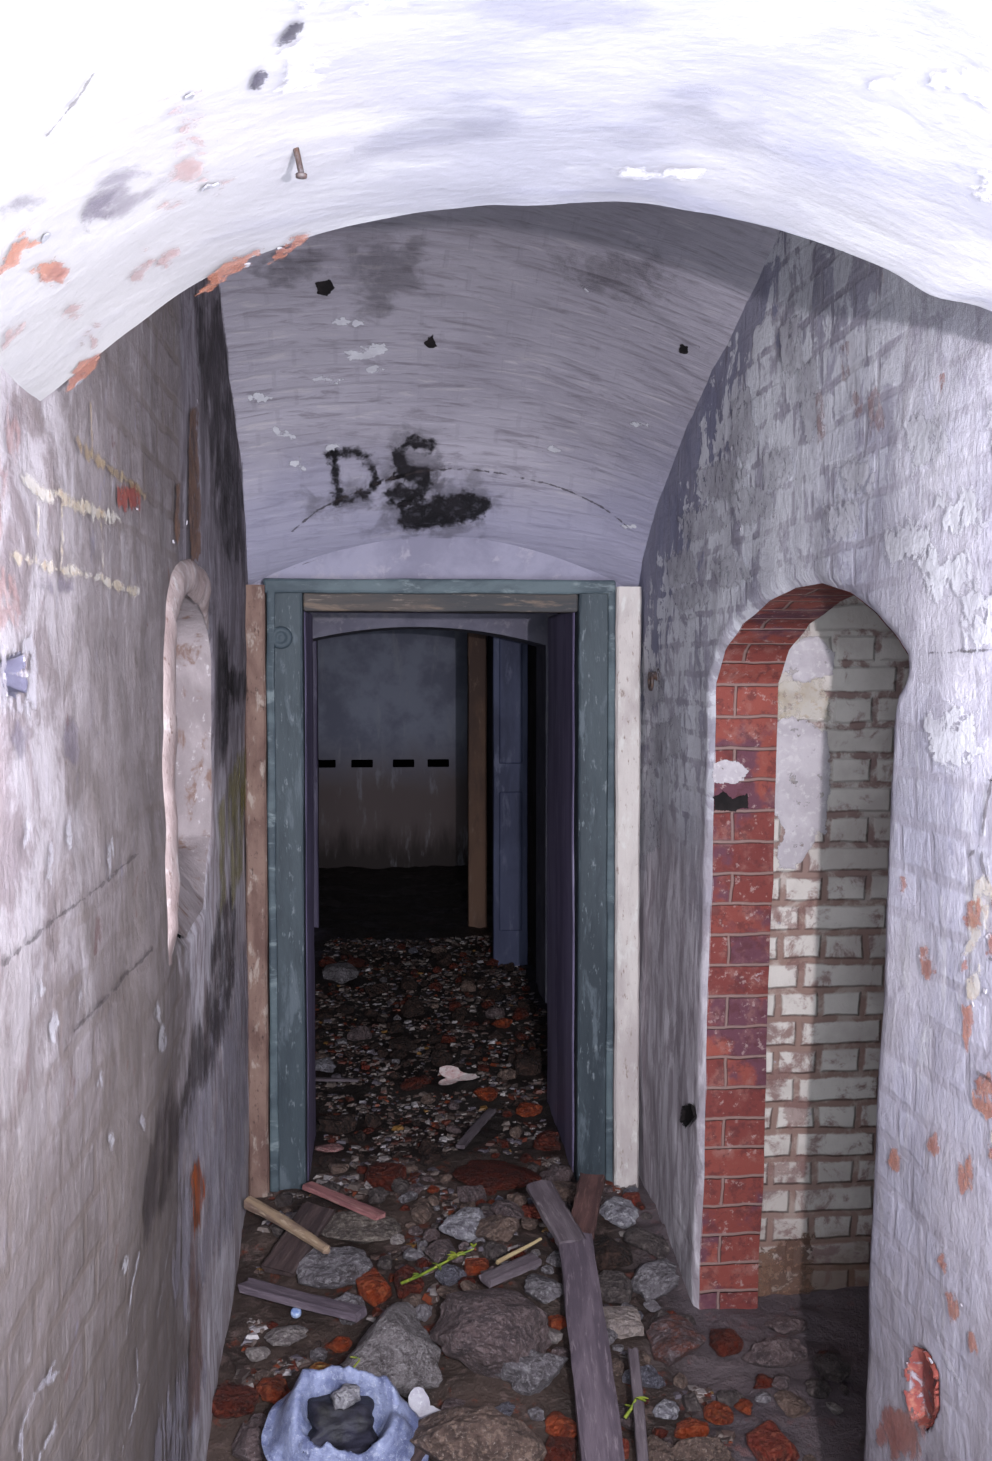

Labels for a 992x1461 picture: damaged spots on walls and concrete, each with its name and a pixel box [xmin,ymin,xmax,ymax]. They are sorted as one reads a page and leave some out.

peeling [278,23,304,47]
peeling [251,70,268,90]
peeling [0,231,70,286]
peeling [195,235,308,296]
peeling [67,353,101,391]
spalling [0,651,28,699]
spalling [713,790,748,812]
crack [969,778,992,883]
crack [4,854,136,966]
crack [74,946,153,1032]
peeling [961,877,992,1052]
spalling [903,1345,940,1430]